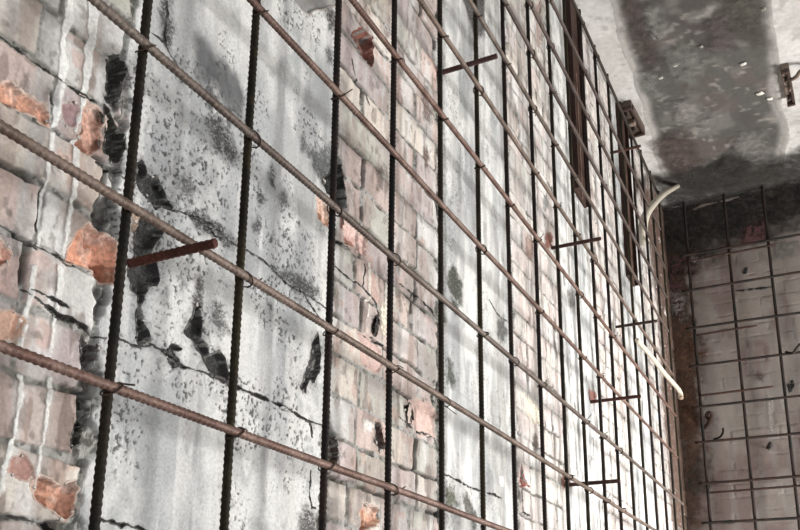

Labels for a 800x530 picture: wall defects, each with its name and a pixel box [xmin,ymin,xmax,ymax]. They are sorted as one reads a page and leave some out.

spalling [104,54,128,108]
spalling [571,0,638,150]
damp [673,99,711,123]
damp [624,0,771,97]
damp [657,137,701,172]
damp [712,134,764,172]
crack [152,203,326,317]
spalling [582,227,638,323]
crack [20,289,322,438]
spalling [183,301,229,383]
spalling [300,332,322,394]
spalling [622,381,679,459]